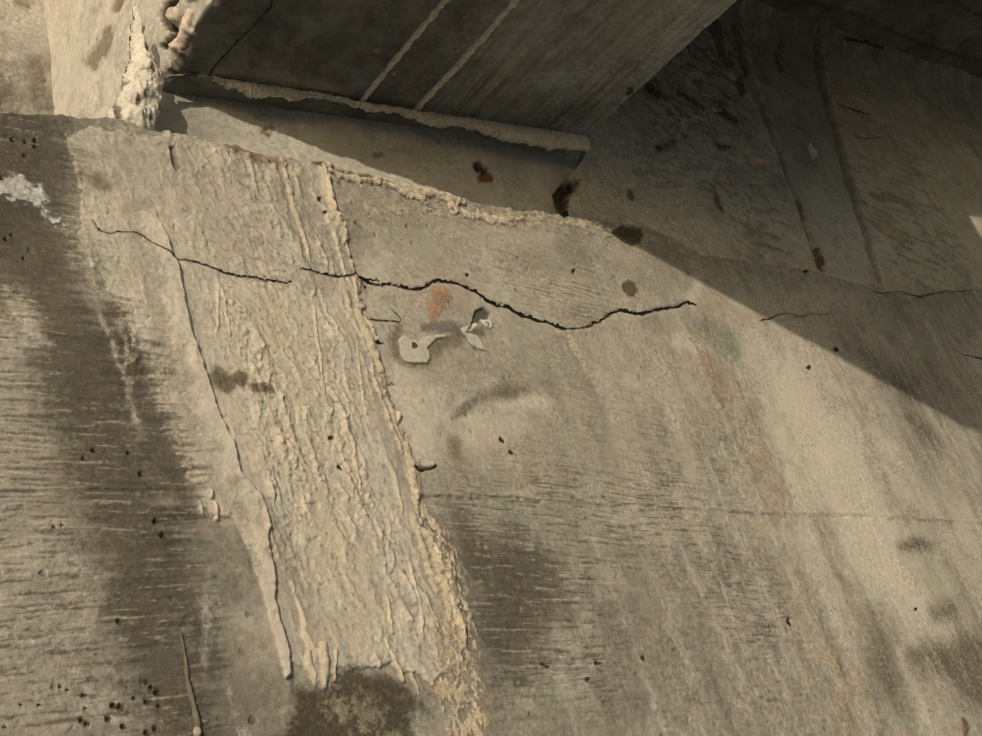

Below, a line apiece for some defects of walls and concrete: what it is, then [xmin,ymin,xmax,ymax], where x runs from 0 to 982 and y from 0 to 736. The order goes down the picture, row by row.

crack [208,0,273,76]
crack [94,221,697,344]
peeling [390,308,492,365]
crack [760,311,832,321]
leakage [0,56,555,736]